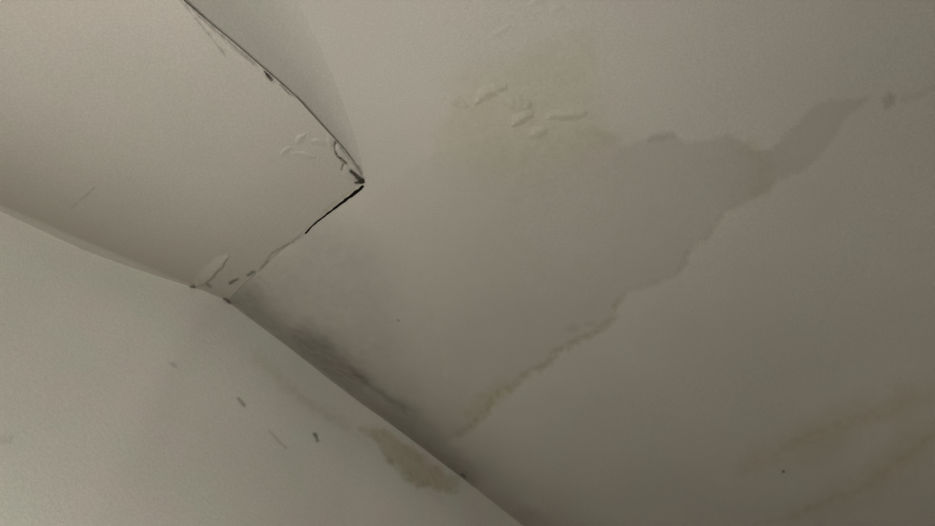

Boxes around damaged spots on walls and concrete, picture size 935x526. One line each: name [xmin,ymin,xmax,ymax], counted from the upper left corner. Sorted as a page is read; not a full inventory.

crack [305,141,364,234]